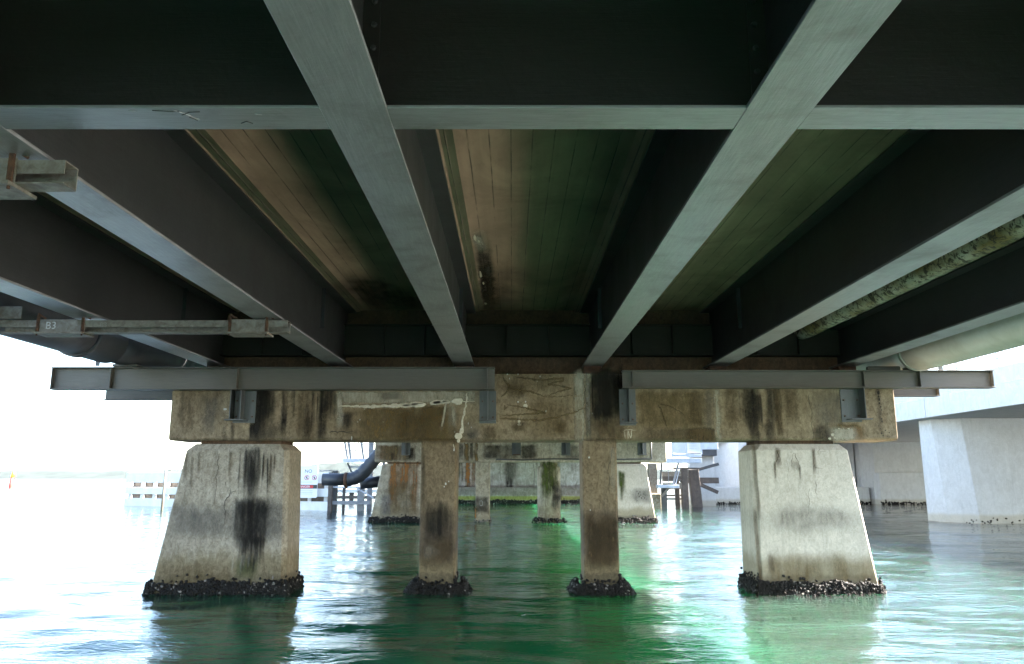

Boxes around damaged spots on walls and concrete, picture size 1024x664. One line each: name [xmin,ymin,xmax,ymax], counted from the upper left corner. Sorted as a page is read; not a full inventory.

water stain [477,252,494,304]
water stain [229,391,294,550]
water stain [300,391,454,459]
water stain [581,369,622,440]
water stain [727,389,800,479]
water stain [754,497,762,579]